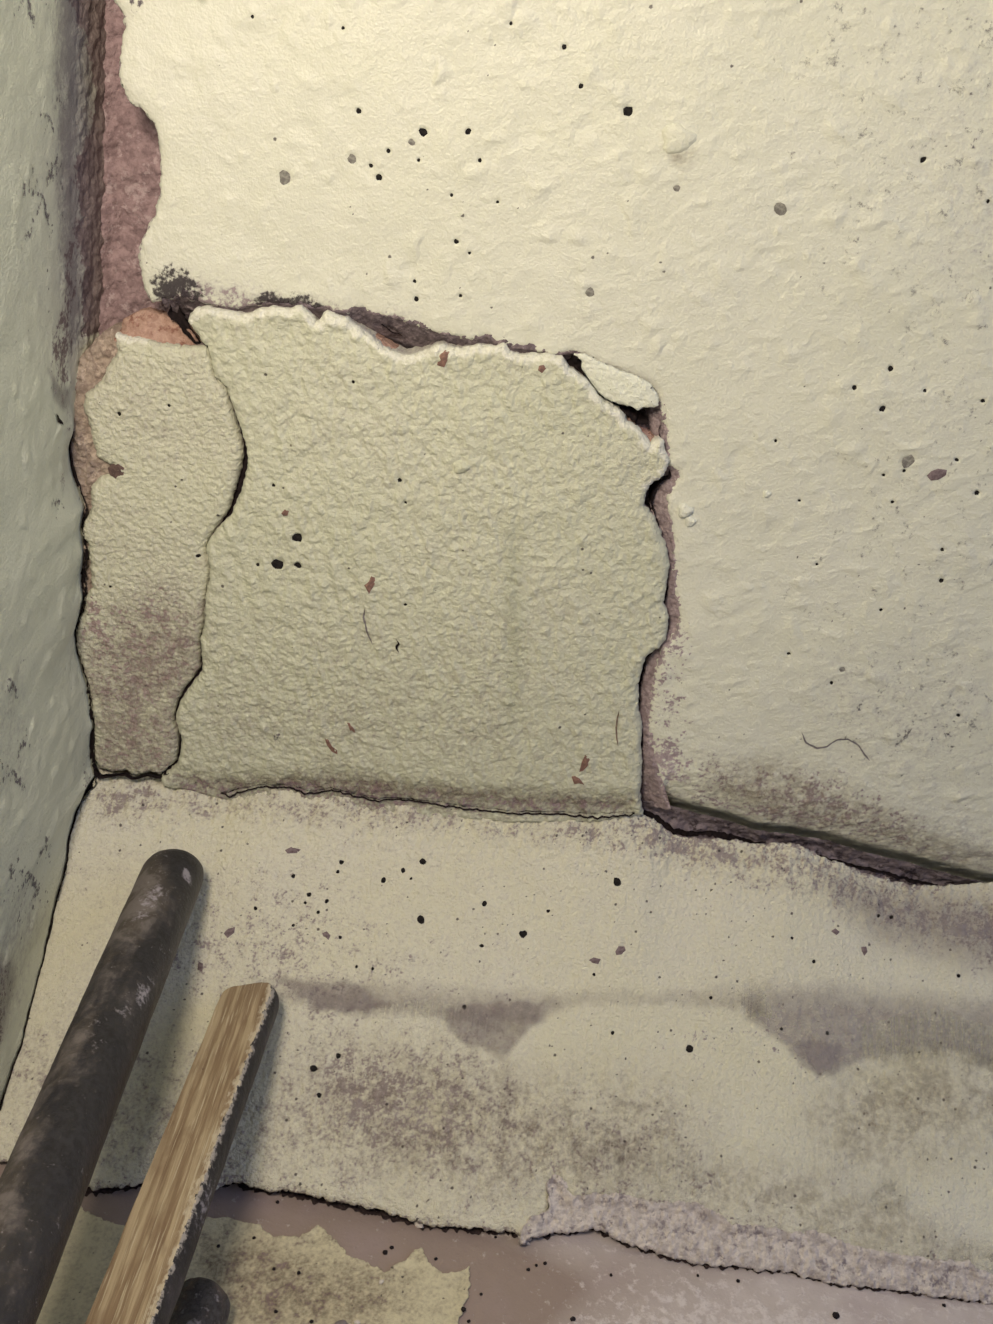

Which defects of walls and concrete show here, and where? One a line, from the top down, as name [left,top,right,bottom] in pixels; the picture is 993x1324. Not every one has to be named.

spalling [71,0,682,810]
crack [647,470,671,527]
crack [220,572,984,886]
peeling [36,1207,125,1324]
peeling [185,1217,471,1324]
spalling [518,1174,993,1305]